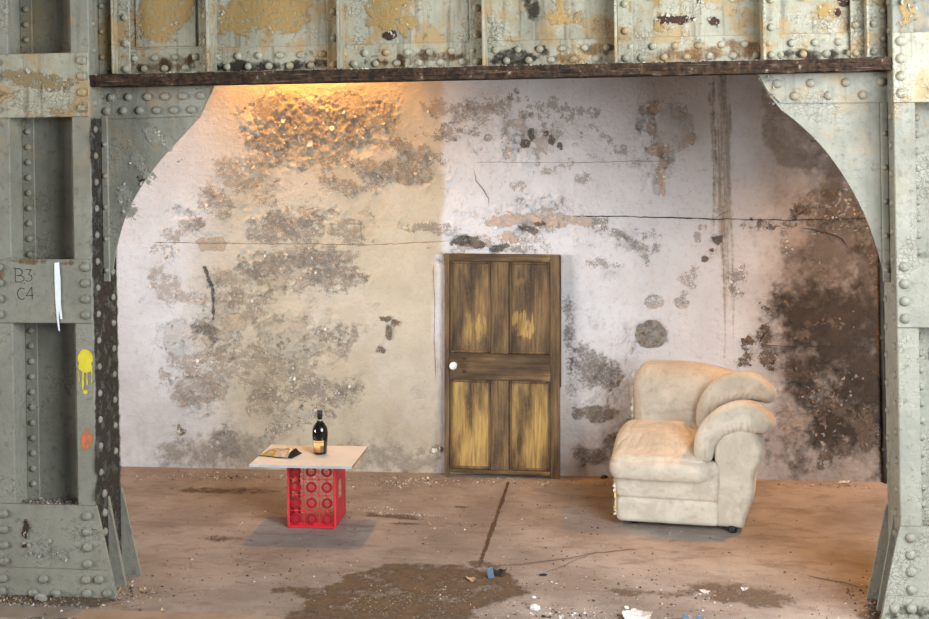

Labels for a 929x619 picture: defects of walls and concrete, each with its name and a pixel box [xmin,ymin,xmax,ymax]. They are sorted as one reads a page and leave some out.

peeling [217,0,316,40]
peeling [364,0,420,41]
peeling [652,0,697,31]
peeling [1,68,79,92]
peeling [295,101,390,148]
spalling [519,127,563,150]
peeling [644,100,696,197]
peeling [114,140,157,221]
spalling [376,315,401,354]
spalling [635,320,667,348]
crack [479,481,629,573]
water stain [271,564,529,619]